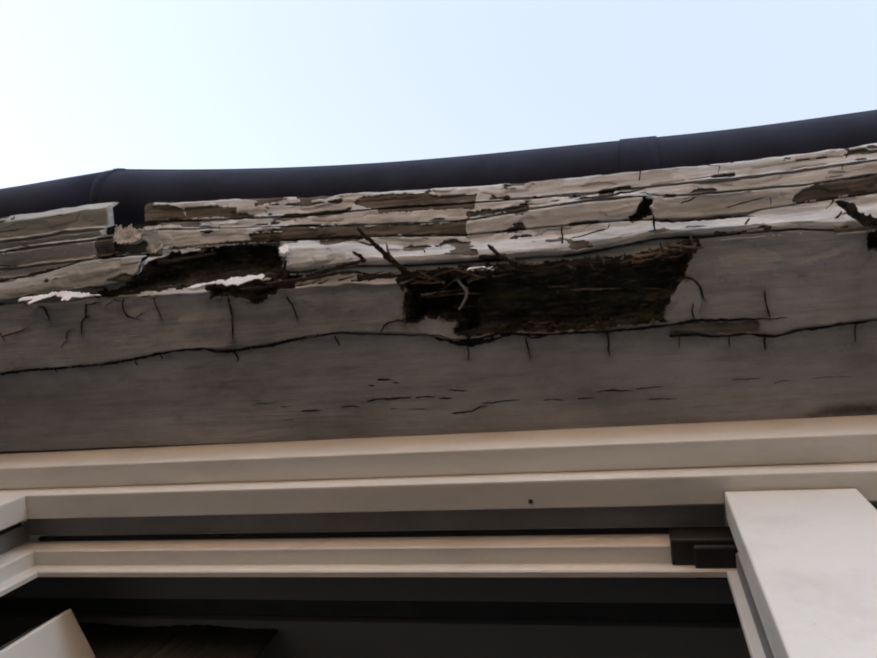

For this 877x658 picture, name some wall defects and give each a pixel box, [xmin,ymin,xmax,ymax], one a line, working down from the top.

peeling [789,173,877,206]
peeling [93,234,148,258]
peeling [144,201,241,227]
peeling [247,189,530,255]
peeling [710,223,776,237]
peeling [18,290,101,305]
peeling [670,279,701,320]
crack [0,277,877,375]